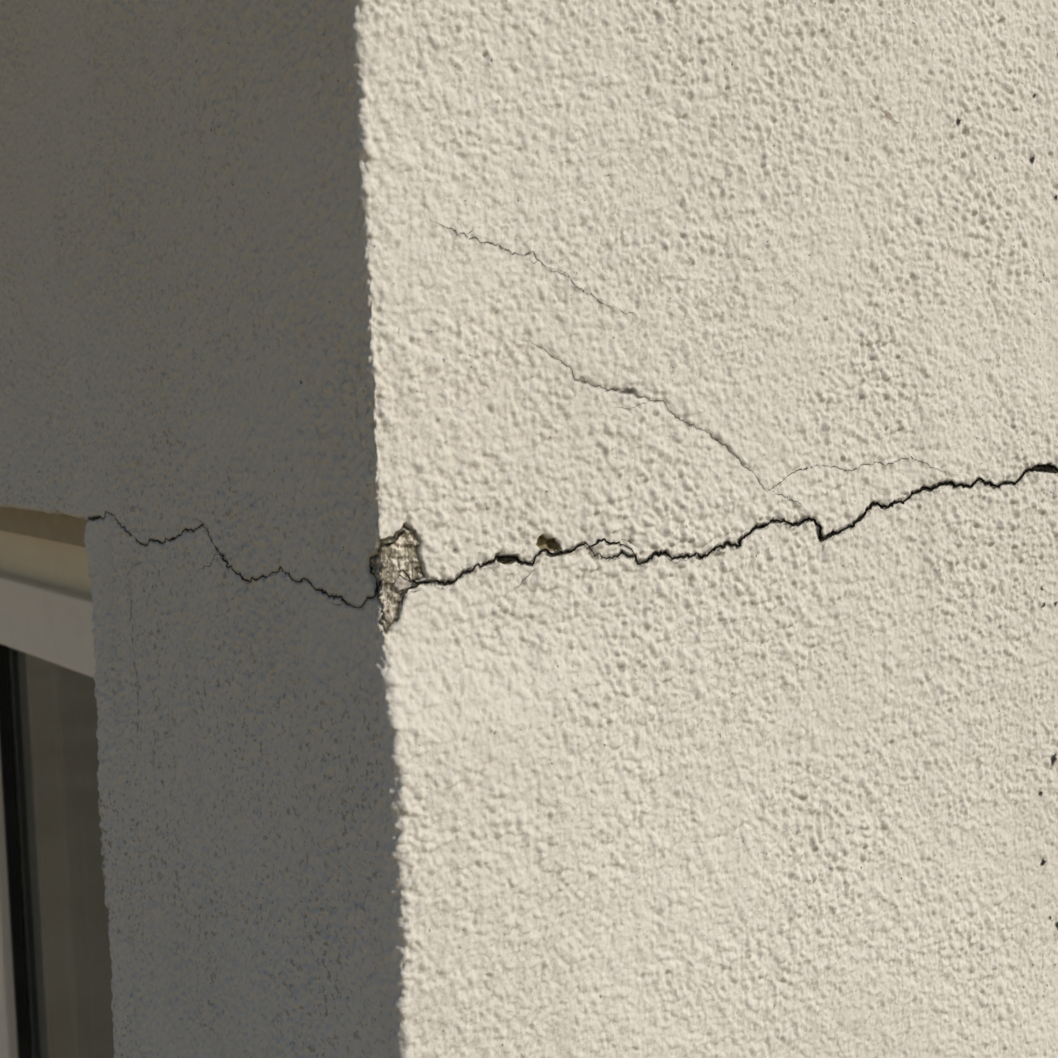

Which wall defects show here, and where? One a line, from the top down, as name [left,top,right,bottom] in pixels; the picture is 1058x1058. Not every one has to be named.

crack [431,220,633,314]
crack [88,340,1058,610]
flaking render [369,524,425,633]